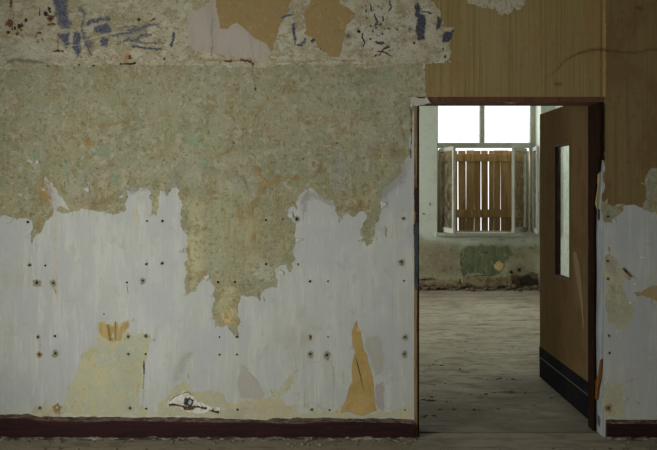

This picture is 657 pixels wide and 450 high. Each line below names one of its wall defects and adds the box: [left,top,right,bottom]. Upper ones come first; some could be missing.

peeling [0,0,453,338]
peeling [603,247,657,329]
peeling [31,318,154,417]
peeling [156,321,412,420]
peeling [602,382,628,418]